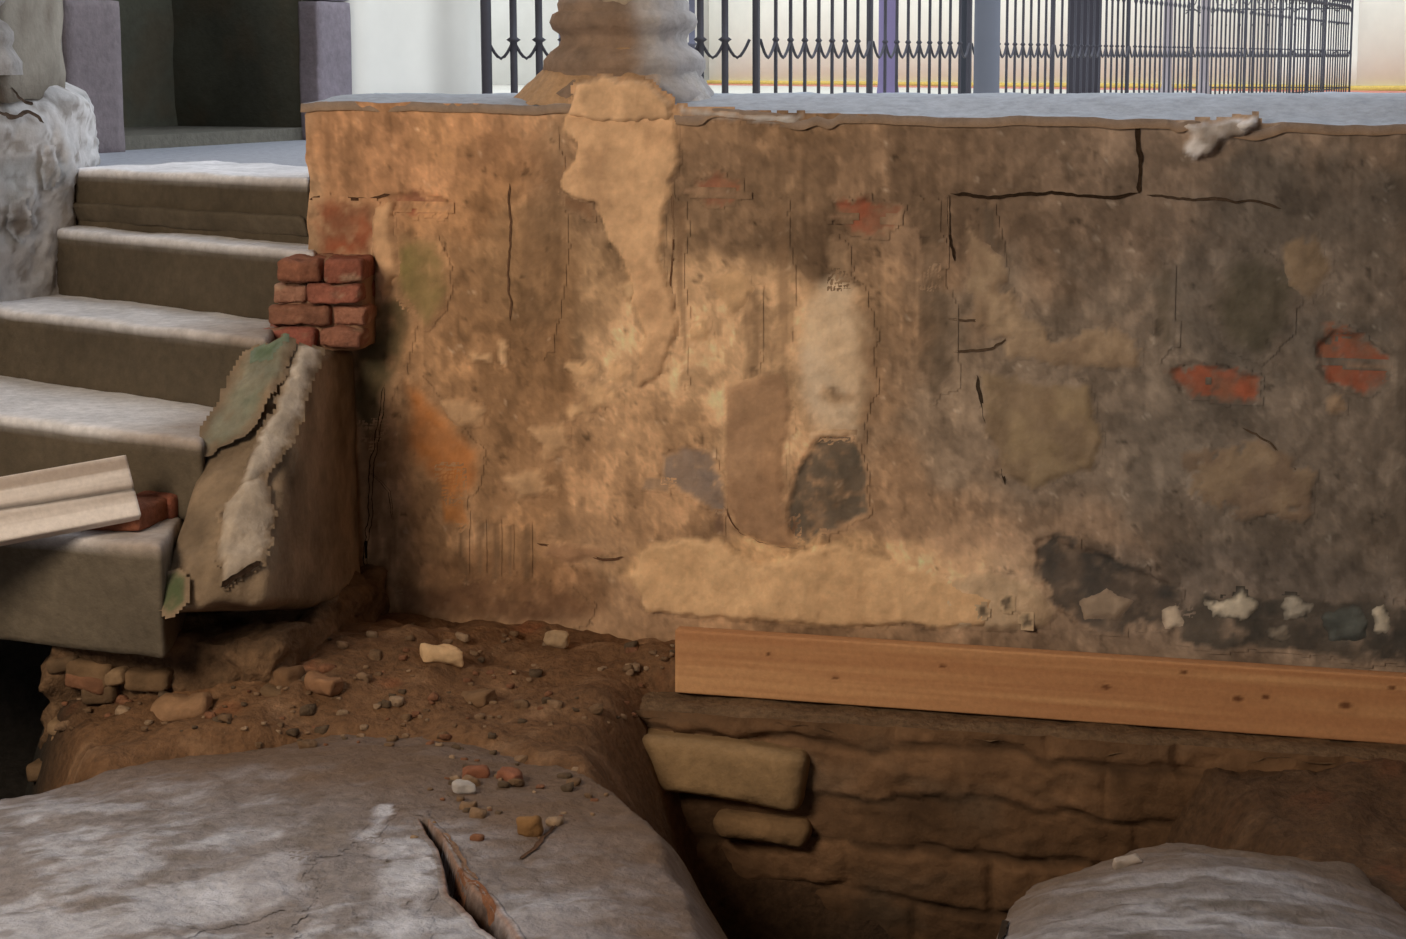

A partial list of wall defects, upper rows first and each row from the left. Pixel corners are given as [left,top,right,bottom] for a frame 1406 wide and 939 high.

crack [947,128,1281,261]
flaking render [499,74,805,503]
spalling [199,187,454,591]
flaking render [440,393,490,429]
crack [413,819,526,939]
crack [520,825,556,859]